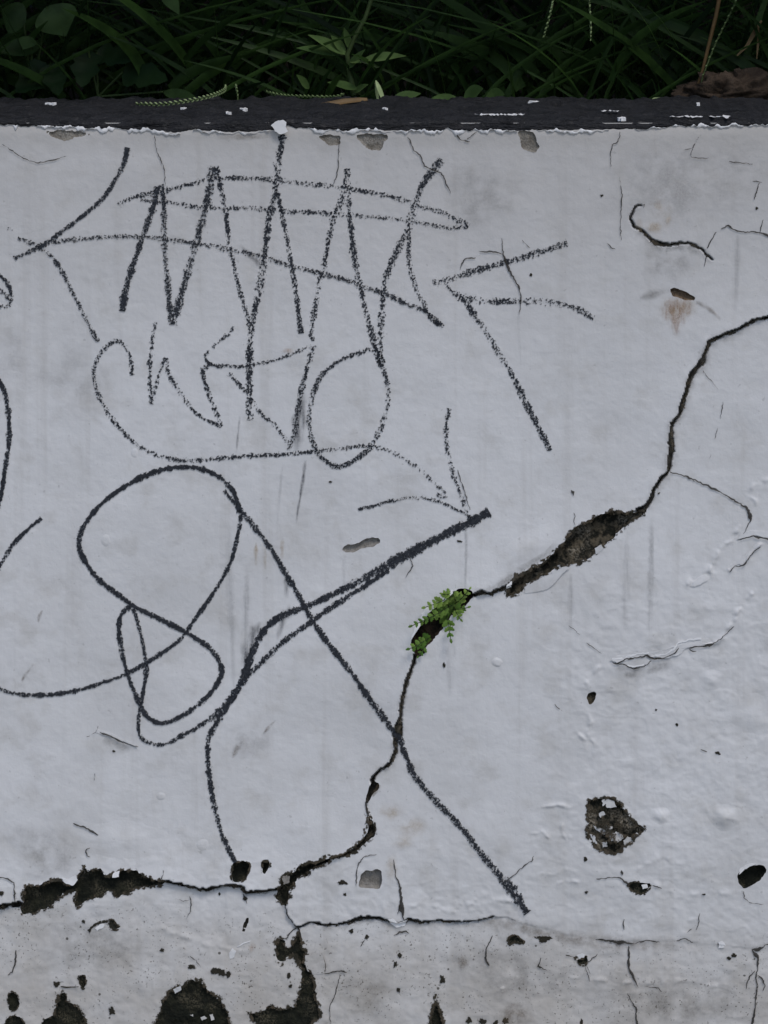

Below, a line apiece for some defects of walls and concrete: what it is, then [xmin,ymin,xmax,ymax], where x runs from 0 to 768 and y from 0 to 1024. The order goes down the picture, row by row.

crack [607,137,768,266]
crack [637,316,768,534]
spalling [342,537,380,553]
crack [473,586,506,597]
crack [365,654,417,816]
crack [73,823,98,874]
spalling [584,796,646,856]
crack [0,877,22,910]
spalling [18,865,166,915]
crack [160,854,515,966]
spalling [737,863,766,888]
spalling [152,977,232,1024]